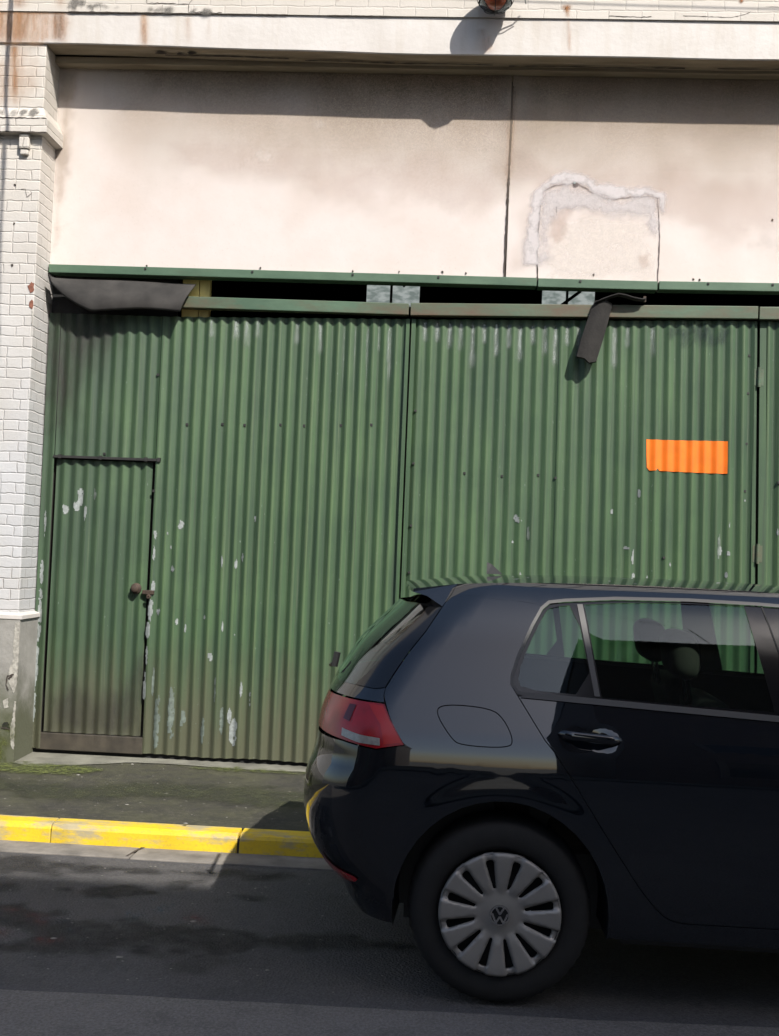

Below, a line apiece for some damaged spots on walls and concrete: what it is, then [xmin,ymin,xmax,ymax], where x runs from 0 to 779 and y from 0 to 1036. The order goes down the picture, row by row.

flaking render [524,172,665,271]
peeling [62,488,97,521]
peeling [143,581,186,749]
peeling [213,677,237,746]